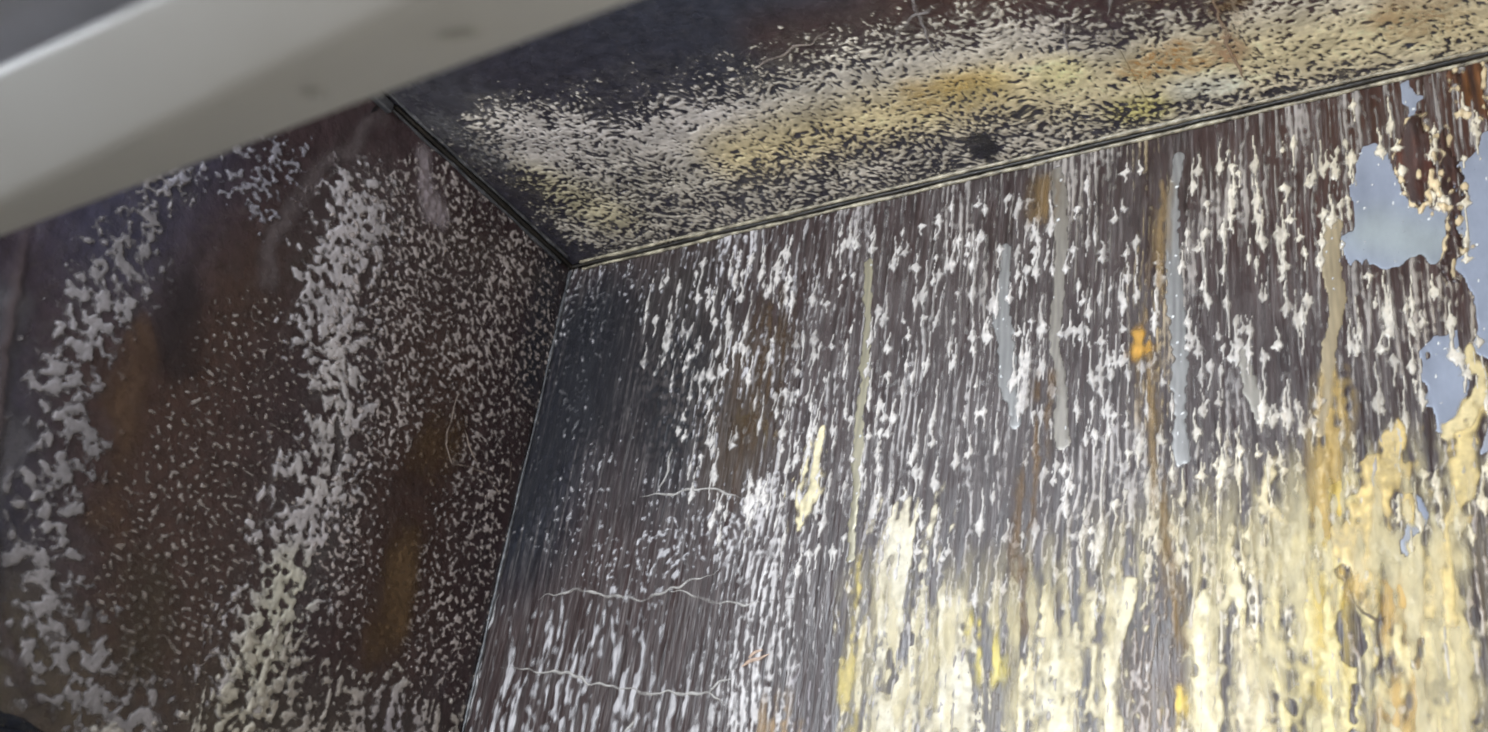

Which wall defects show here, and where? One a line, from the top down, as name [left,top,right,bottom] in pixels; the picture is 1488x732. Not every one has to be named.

peeling [1400,80,1423,117]
peeling [1341,131,1488,433]
damp [309,0,1488,732]
damp [86,292,315,688]
peeling [1400,494,1429,557]
peeling [1480,415,1488,455]
damp [179,619,441,732]